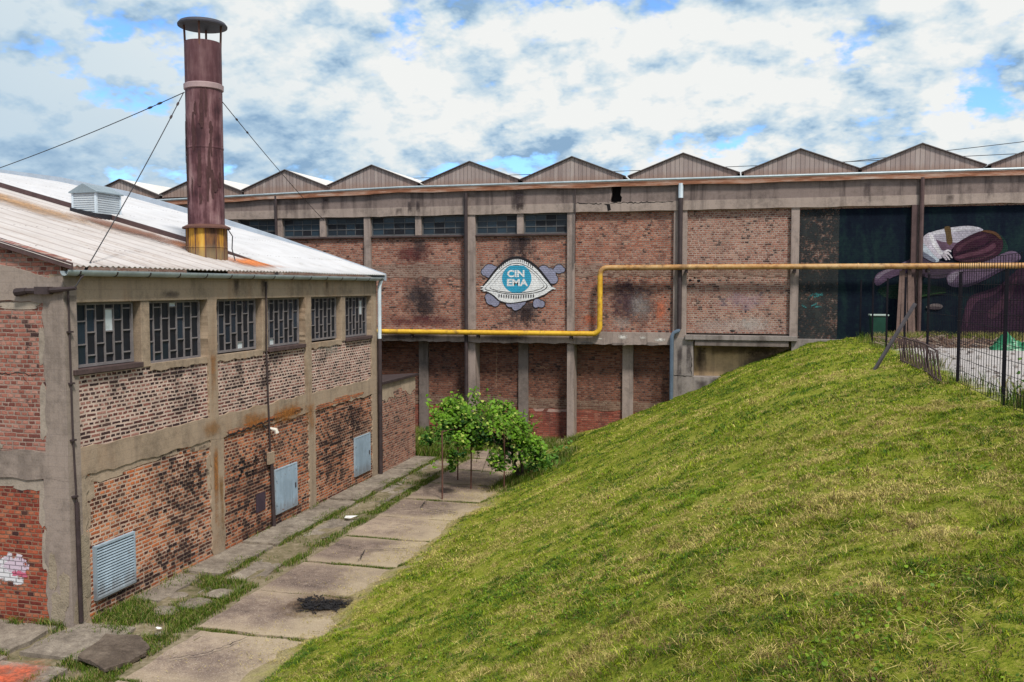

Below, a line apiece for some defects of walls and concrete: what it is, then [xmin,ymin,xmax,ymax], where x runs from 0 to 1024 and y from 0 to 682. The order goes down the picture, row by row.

spalling [605,187,622,211]
water stain [392,277,442,338]
peeling [39,382,48,440]
water stain [320,399,368,488]
spalling [0,440,211,624]
water stain [102,449,206,609]
water stain [231,443,294,540]